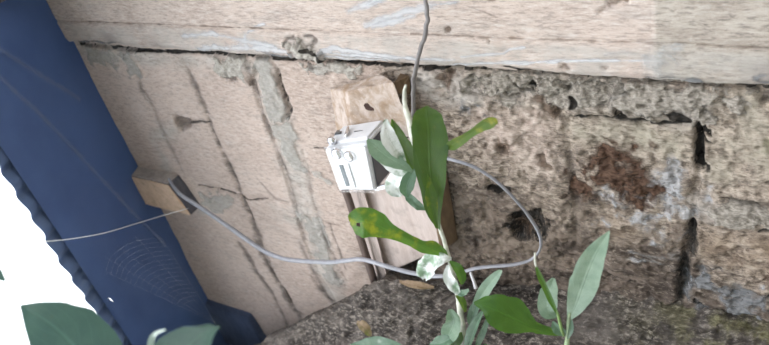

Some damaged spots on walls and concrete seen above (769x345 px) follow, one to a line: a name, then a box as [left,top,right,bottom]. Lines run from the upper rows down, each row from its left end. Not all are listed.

crack [80,42,314,120]
crack [333,59,545,73]
crack [720,81,769,89]
crack [574,112,712,172]
rust [561,137,673,211]
damp [446,171,614,286]
spalling [708,197,769,230]
damp [386,260,418,279]
crack [677,217,706,308]